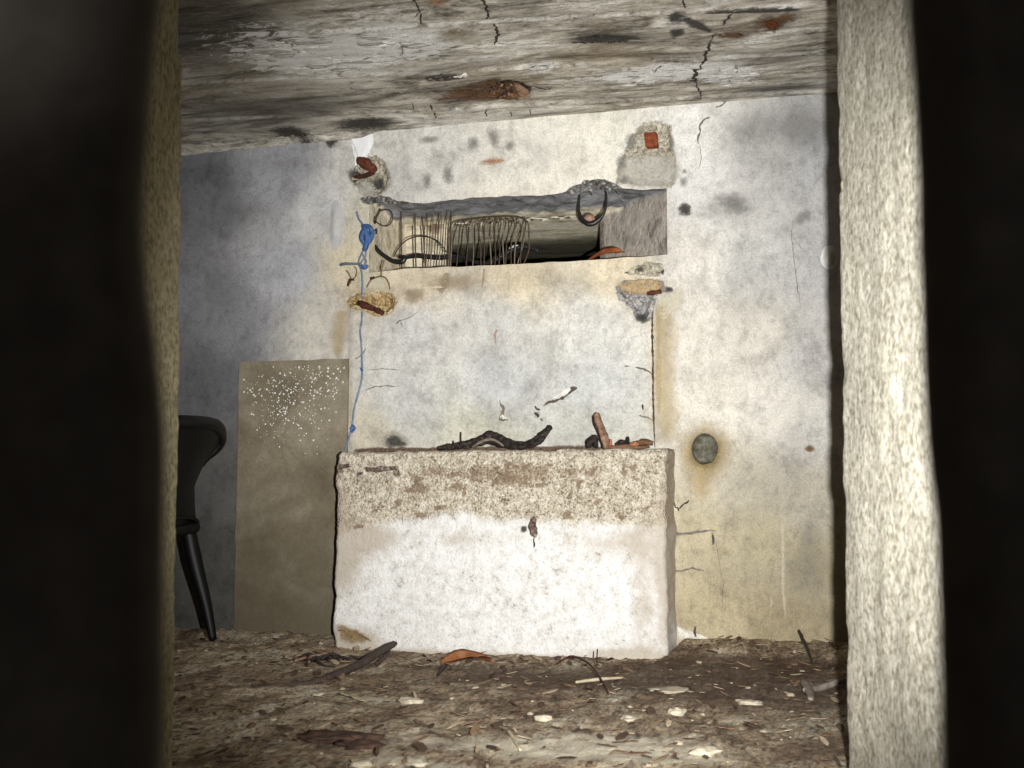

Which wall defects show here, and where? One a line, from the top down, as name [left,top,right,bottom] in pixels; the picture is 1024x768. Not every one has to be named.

crack [413,0,422,25]
crack [481,0,515,45]
crack [690,14,732,167]
spalling [349,155,412,205]
spalling [565,121,678,196]
spalling [347,291,398,317]
spalling [616,262,673,323]